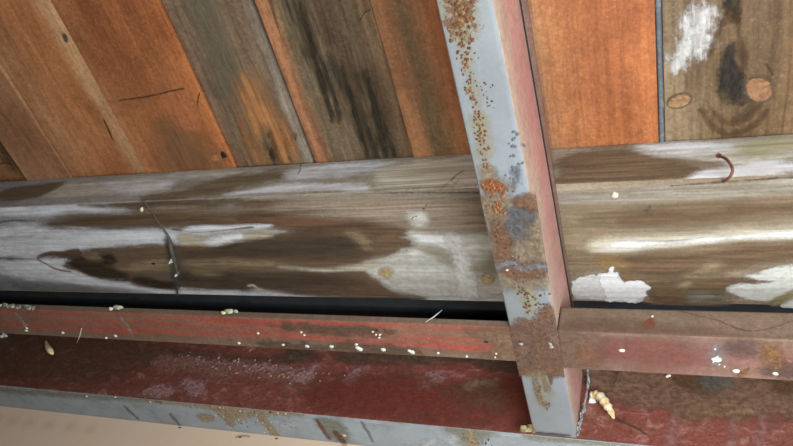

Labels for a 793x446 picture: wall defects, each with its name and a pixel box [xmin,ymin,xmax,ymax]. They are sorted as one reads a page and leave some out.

water stain [722,0,742,26]
water stain [0,0,504,301]
rust [443,0,565,410]
peeling [571,267,651,303]
water stain [555,43,793,184]
water stain [567,196,793,306]
rust [582,343,793,422]